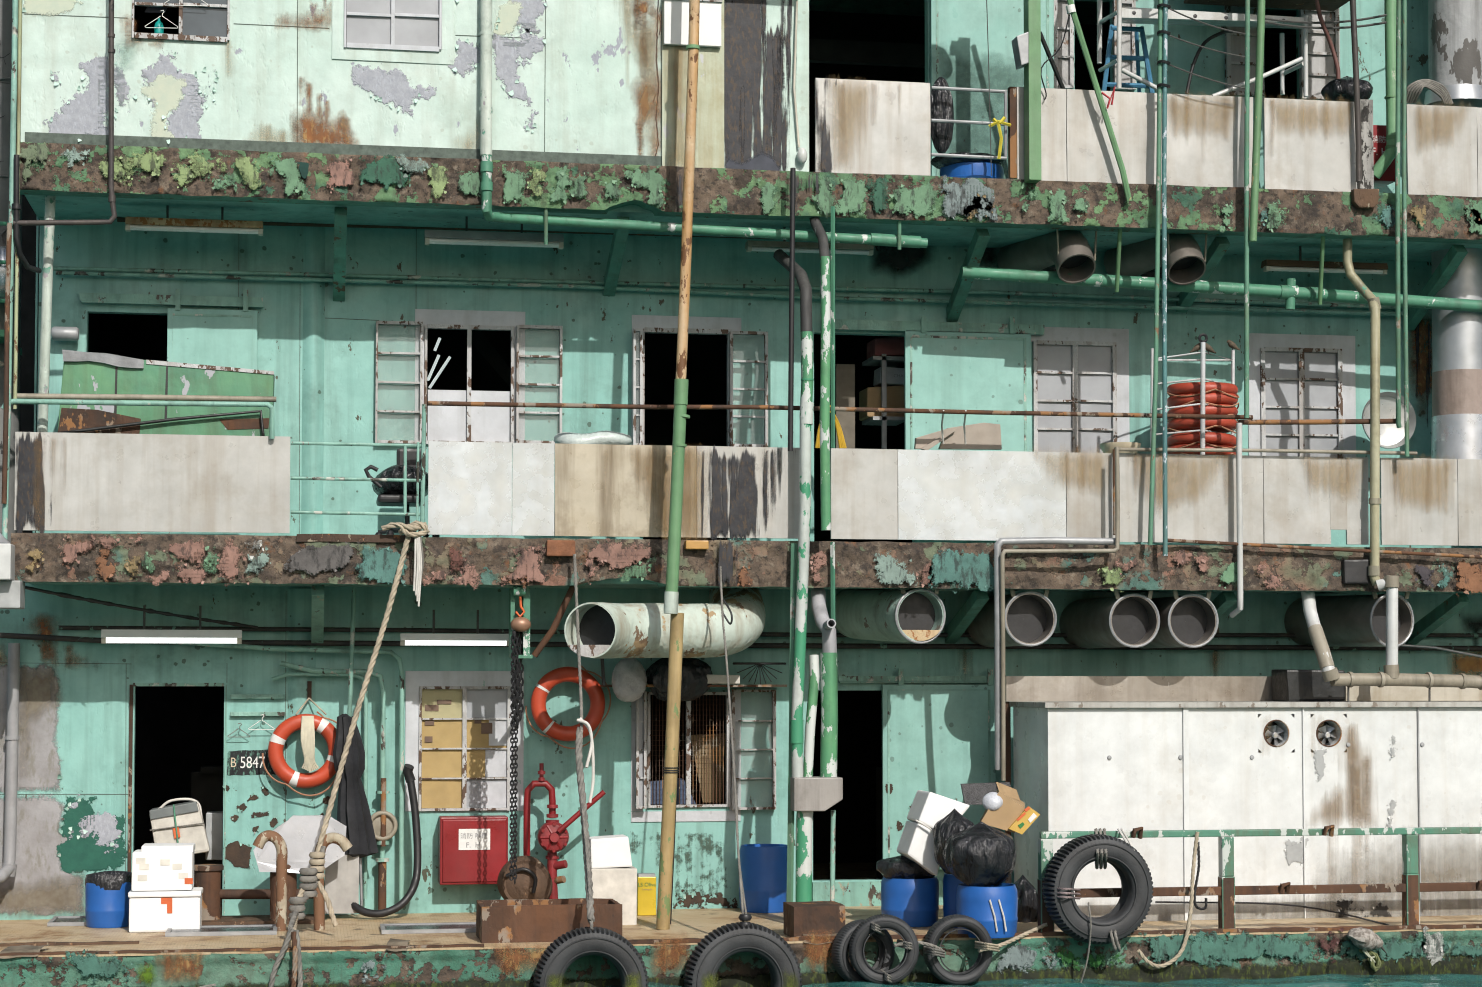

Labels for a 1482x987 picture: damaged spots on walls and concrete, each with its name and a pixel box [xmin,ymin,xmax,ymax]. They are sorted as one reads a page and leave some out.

rust [633,0,662,54]
peeling [0,48,307,196]
rust [295,80,354,144]
peeling [351,63,437,117]
peeling [448,0,547,133]
rust [637,81,676,154]
damp [761,0,792,144]
peeling [326,153,481,199]
peeling [502,164,666,208]
peeling [812,171,998,221]
damp [764,449,781,528]
peeling [0,664,128,916]